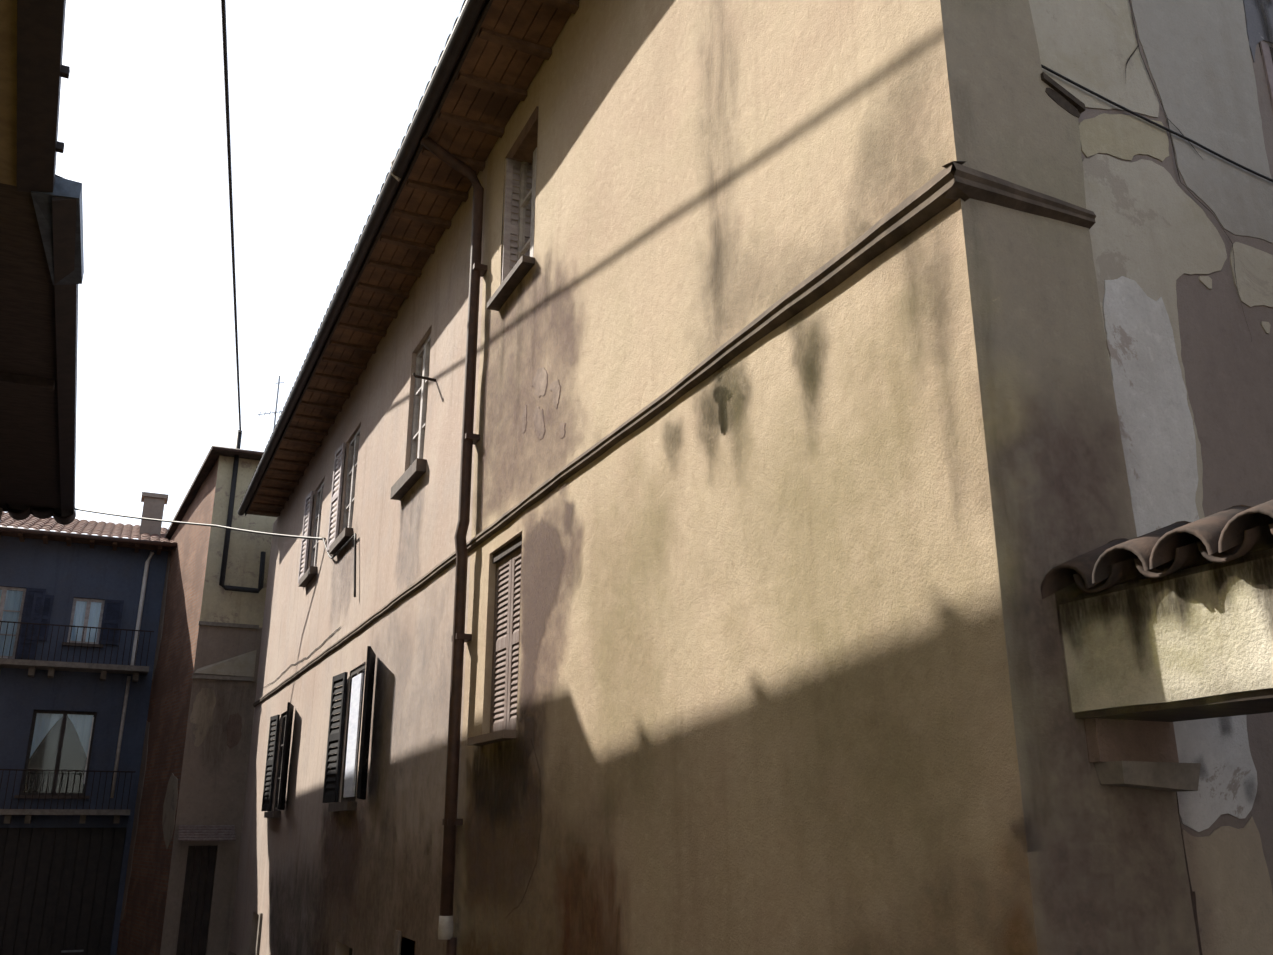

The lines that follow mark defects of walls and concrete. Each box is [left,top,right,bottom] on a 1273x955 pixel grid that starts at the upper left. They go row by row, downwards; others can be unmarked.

damp [481,282,574,507]
damp [797,326,819,403]
peeling [1029,0,1273,537]
crack [1125,0,1252,342]
damp [1037,567,1195,668]
damp [1213,553,1273,629]
flaking render [1173,715,1273,955]